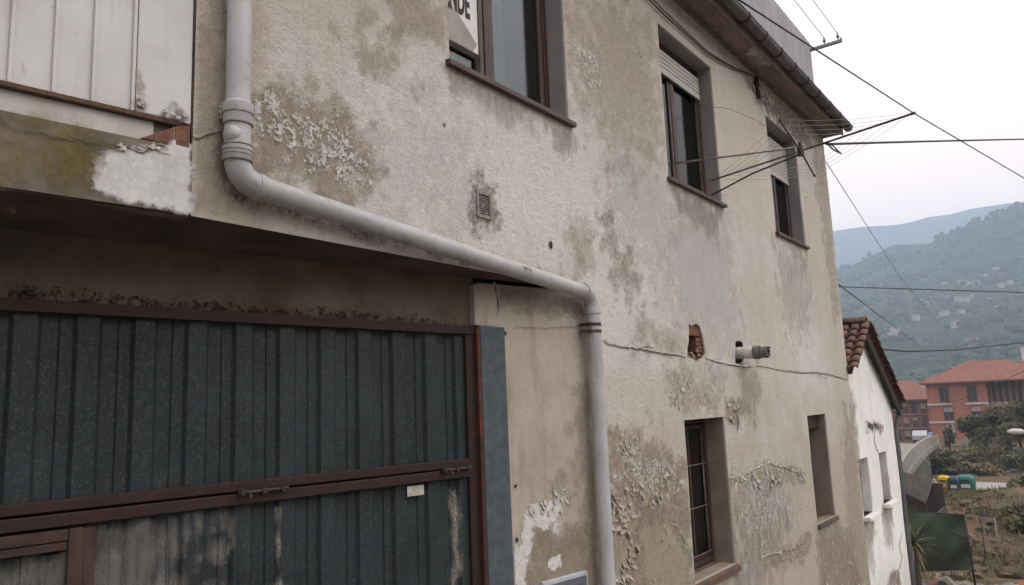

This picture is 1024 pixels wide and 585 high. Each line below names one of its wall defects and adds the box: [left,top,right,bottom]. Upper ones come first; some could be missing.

leakage [252,85,375,206]
leakage [7,283,466,326]
crack [493,282,848,380]
spalling [687,324,704,361]
leakage [89,510,235,585]
peeling [514,469,598,585]
peeling [607,428,689,585]